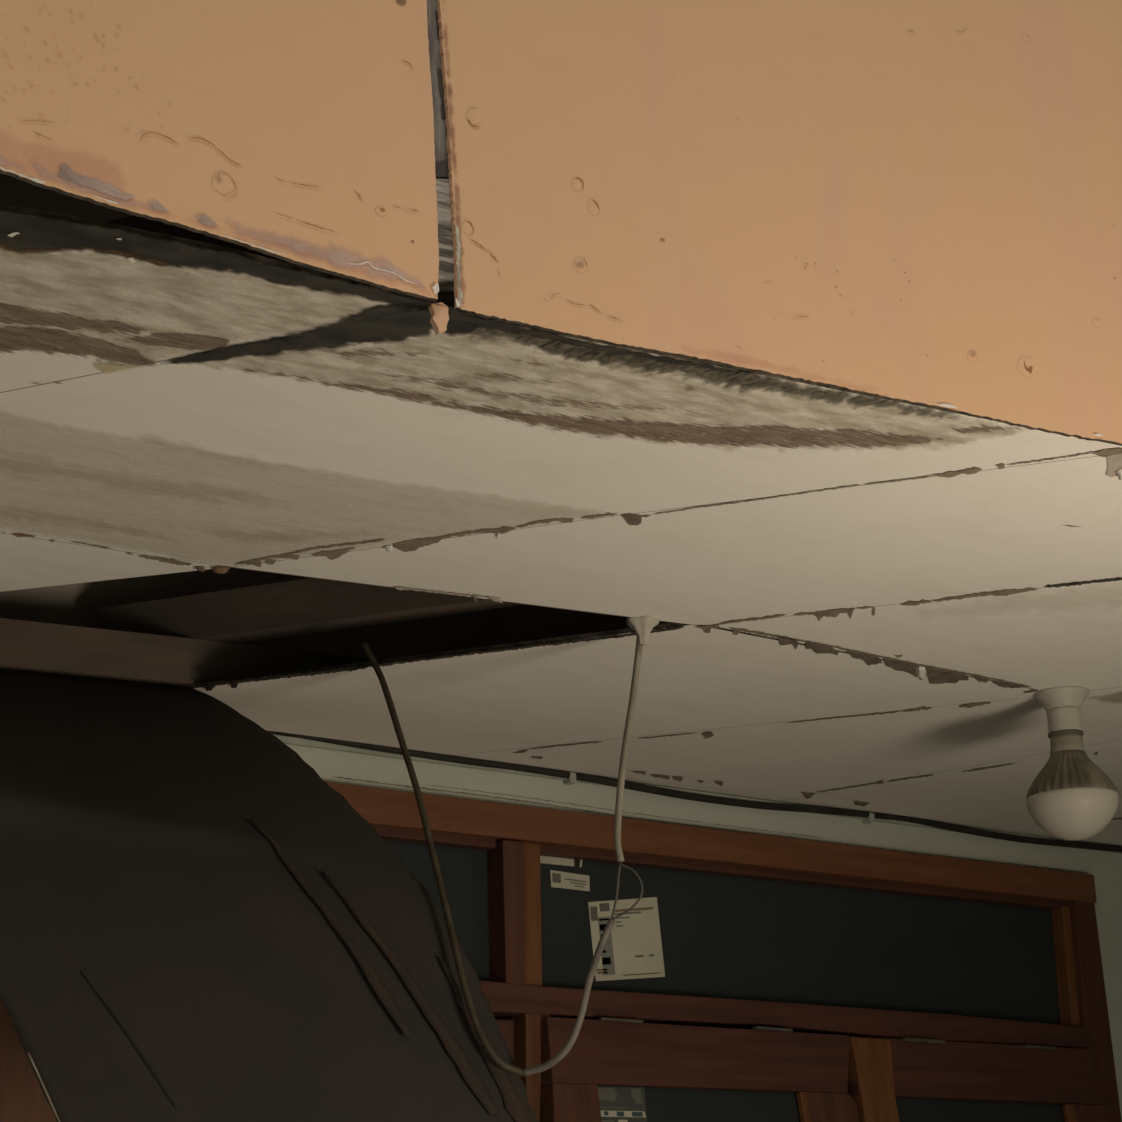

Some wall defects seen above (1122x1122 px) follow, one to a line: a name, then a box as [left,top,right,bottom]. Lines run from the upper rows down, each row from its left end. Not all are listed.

flaking render [0,156,168,222]
peeling [198,215,420,285]
damp [0,210,1017,450]
peeling [995,434,1122,480]
flaking render [0,468,982,628]
peeling [901,578,1122,606]
flaking render [237,605,630,659]
peeling [696,606,1038,693]
peeling [791,706,933,723]
peeling [627,770,723,786]
peeling [801,774,933,799]
spalling [27,1052,60,1122]